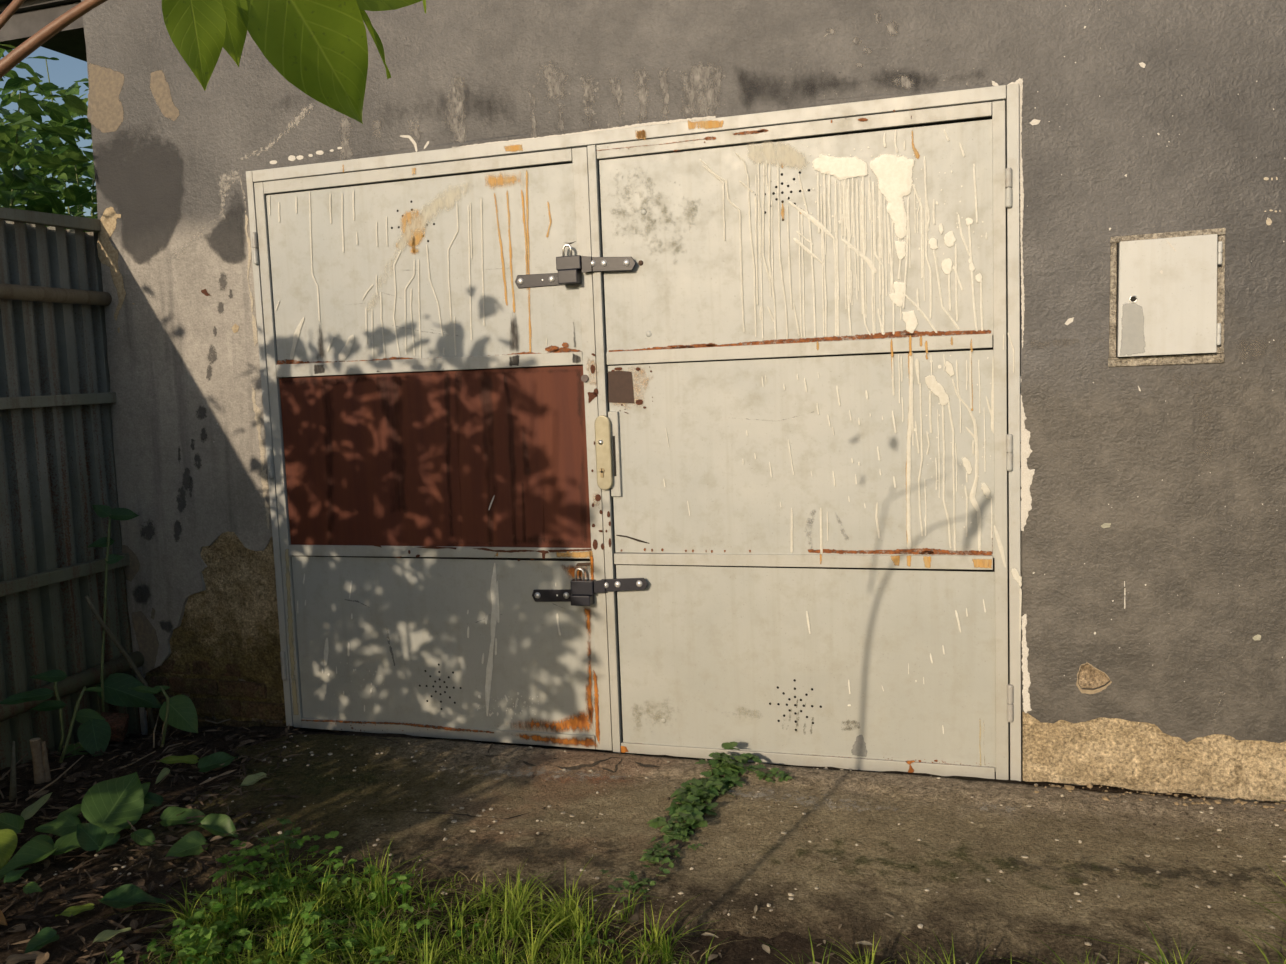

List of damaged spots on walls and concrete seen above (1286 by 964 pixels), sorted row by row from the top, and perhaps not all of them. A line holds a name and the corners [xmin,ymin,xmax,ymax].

water stain [446,77,465,143]
water stain [529,62,789,137]
rust [596,120,768,151]
water stain [94,132,246,380]
rust [488,171,594,362]
rust [277,357,416,365]
rust [595,330,991,413]
water stain [174,406,207,542]
flaking render [145,531,286,735]
rust [519,608,600,747]
flaking render [1076,662,1112,694]
flaking render [1023,712,1286,802]